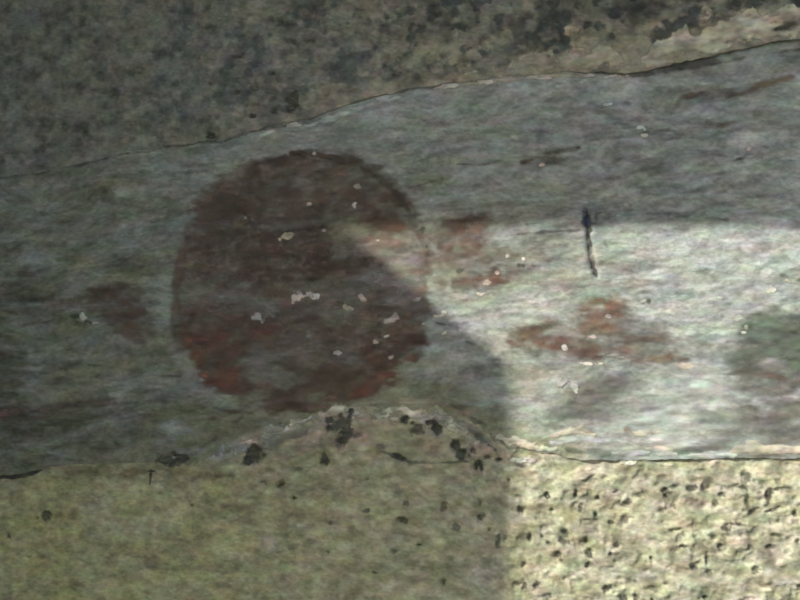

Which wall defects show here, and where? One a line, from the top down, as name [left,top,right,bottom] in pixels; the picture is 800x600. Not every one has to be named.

crack [432,57,743,90]
crack [247,95,402,136]
crack [163,140,222,148]
corrosion [439,215,490,246]
crack [521,211,606,277]
corrosion [172,150,432,413]
corrosion [475,270,507,296]
corrosion [523,325,659,366]
crack [0,469,42,479]
spalling [155,451,189,467]
spalling [219,397,624,471]
peeling [687,440,800,458]